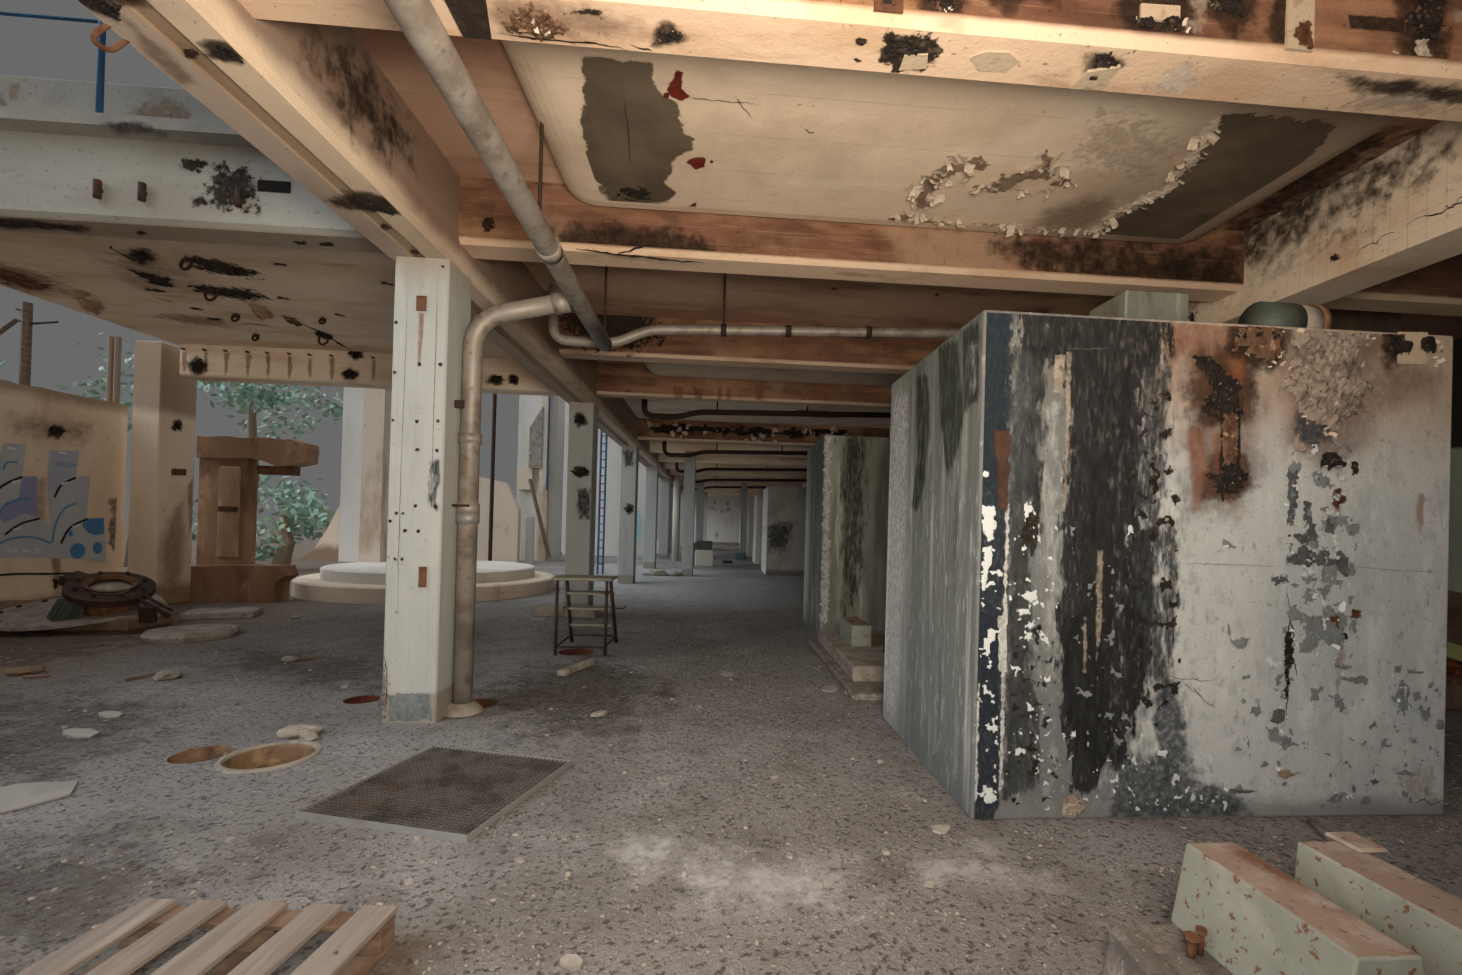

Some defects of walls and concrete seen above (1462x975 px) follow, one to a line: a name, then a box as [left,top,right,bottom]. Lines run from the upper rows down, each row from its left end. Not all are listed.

spalling [599,185,659,204]
peeling [888,116,1225,238]
crack [1357,196,1462,255]
leakage [819,433,867,624]
leakage [884,312,1245,819]
peeling [977,392,1268,818]
spalling [1190,326,1446,786]
peeling [1316,665,1445,811]